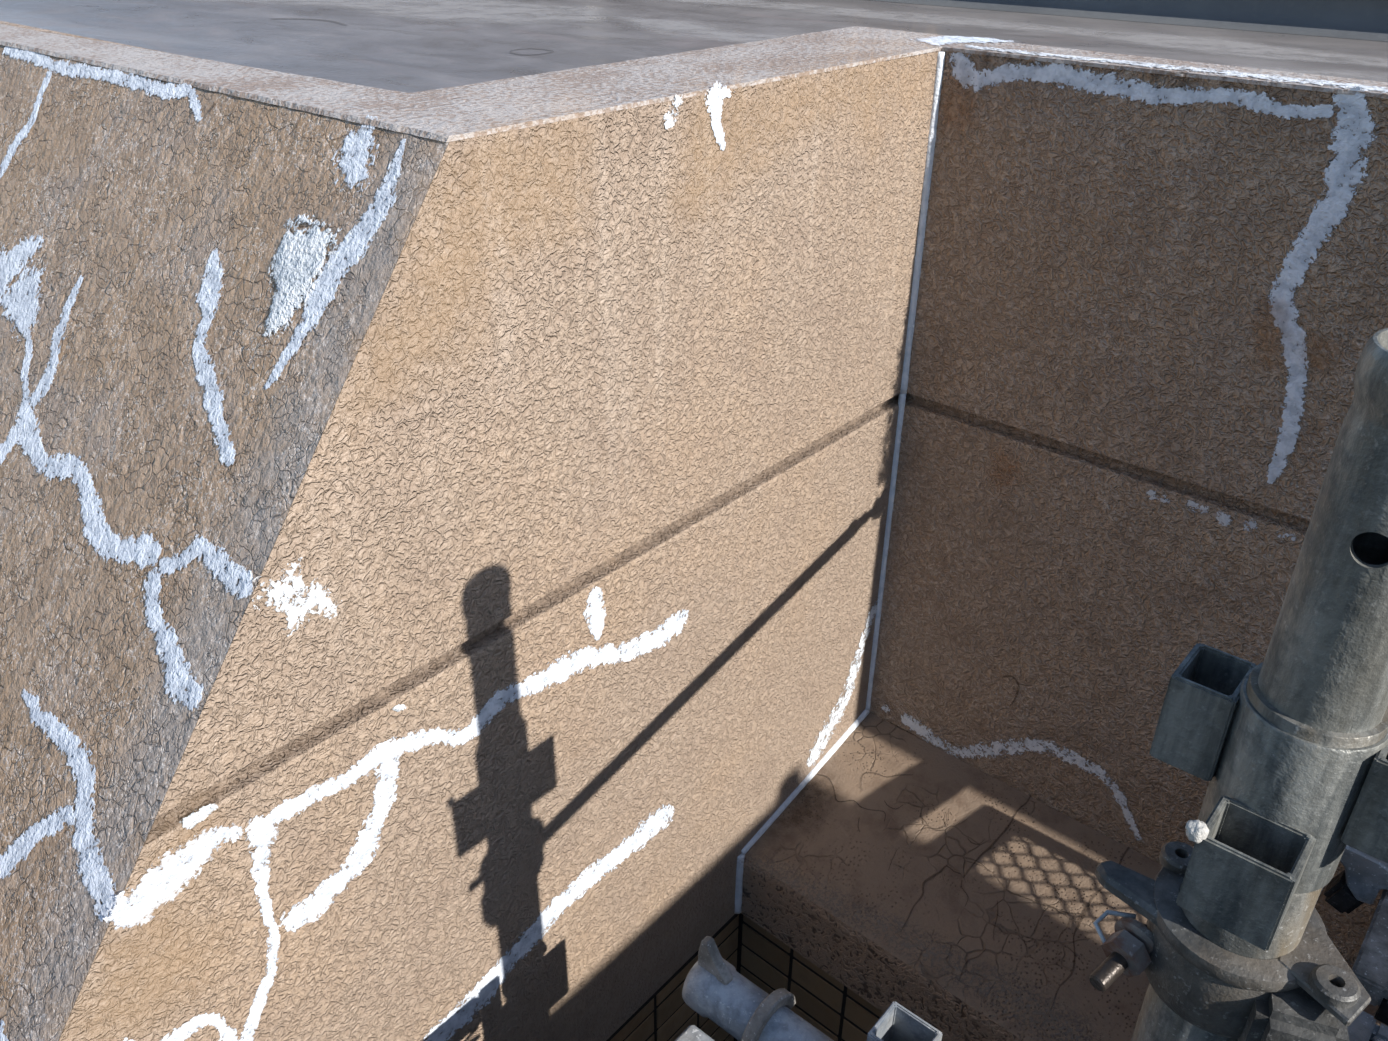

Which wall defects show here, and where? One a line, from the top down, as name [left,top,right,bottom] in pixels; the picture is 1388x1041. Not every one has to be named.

crack [0,46,215,178]
crack [0,232,253,711]
crack [264,128,406,389]
crack [949,52,1377,484]
crack [0,609,689,1041]
crack [807,600,1142,1024]